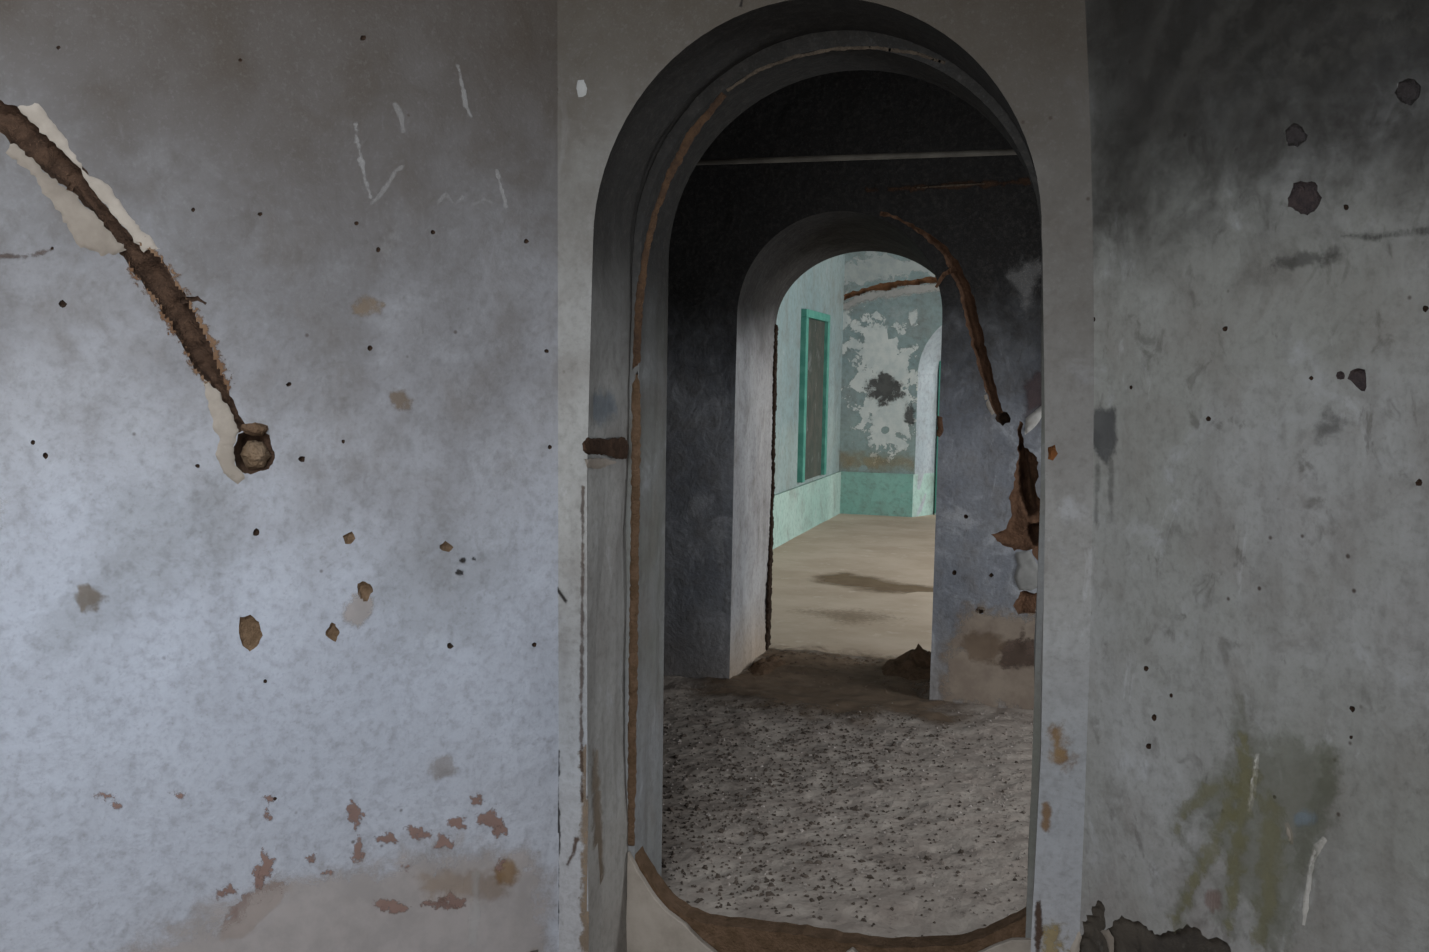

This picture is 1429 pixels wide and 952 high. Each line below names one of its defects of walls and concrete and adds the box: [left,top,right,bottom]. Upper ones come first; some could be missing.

spalling [1395,78,1421,106]
spalling [1285,123,1308,147]
spalling [1288,181,1322,215]
crack [0,100,245,446]
crack [843,178,1031,426]
spalling [582,46,946,846]
spalling [991,372,1058,615]
peeling [346,794,508,863]
peeling [216,847,284,930]
peeling [375,890,466,914]
spalling [1070,900,1231,952]